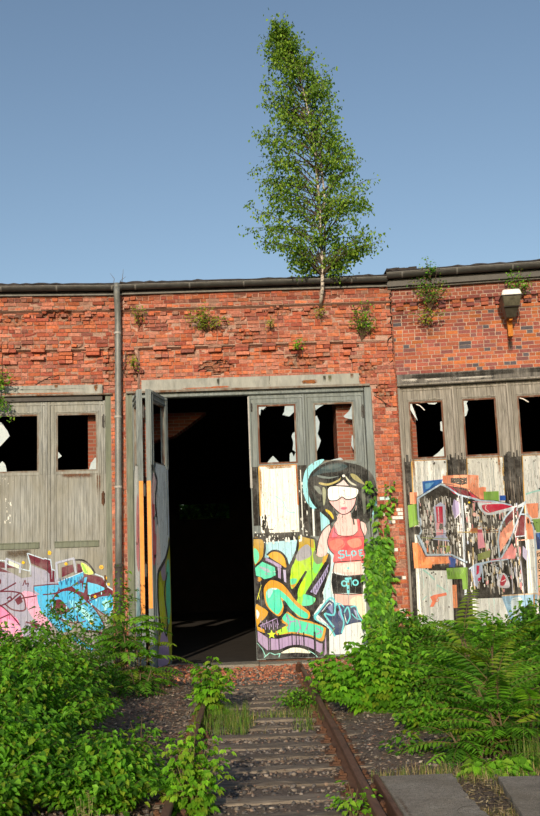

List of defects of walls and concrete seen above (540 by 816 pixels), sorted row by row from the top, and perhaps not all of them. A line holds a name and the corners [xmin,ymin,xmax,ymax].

peeling [261,482,308,544]